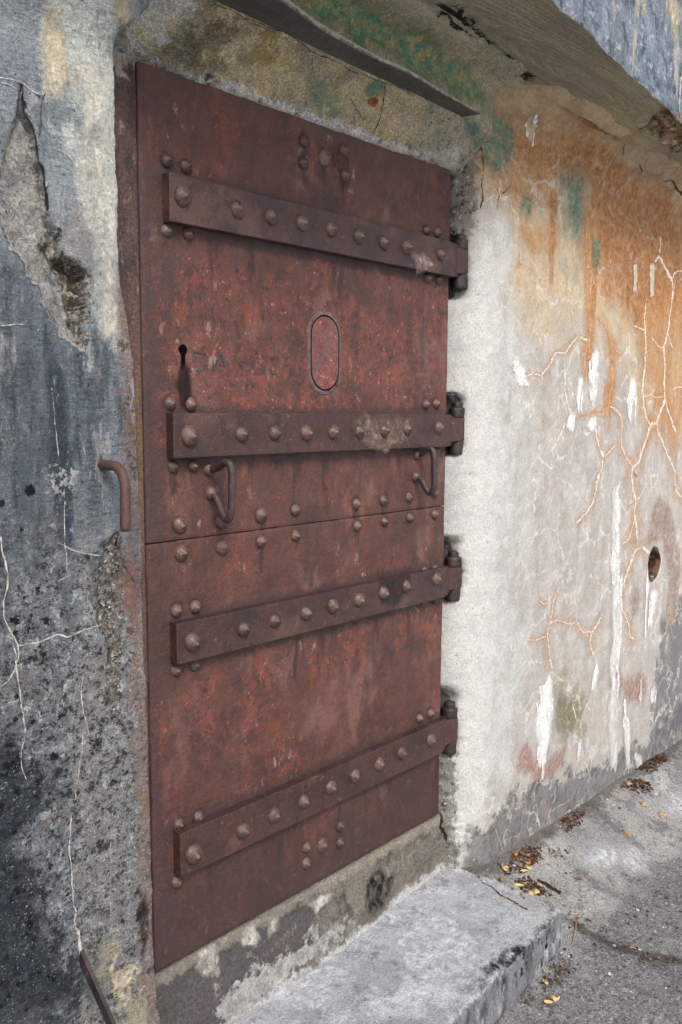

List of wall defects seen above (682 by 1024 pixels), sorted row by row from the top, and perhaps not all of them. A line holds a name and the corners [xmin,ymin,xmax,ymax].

spalling [0,107,93,352]
damp [304,0,483,103]
damp [468,115,537,168]
corrosion [561,134,682,449]
crack [510,213,682,672]
crack [0,537,101,779]
crack [68,675,89,954]
damp [536,676,555,780]
damp [639,678,657,704]